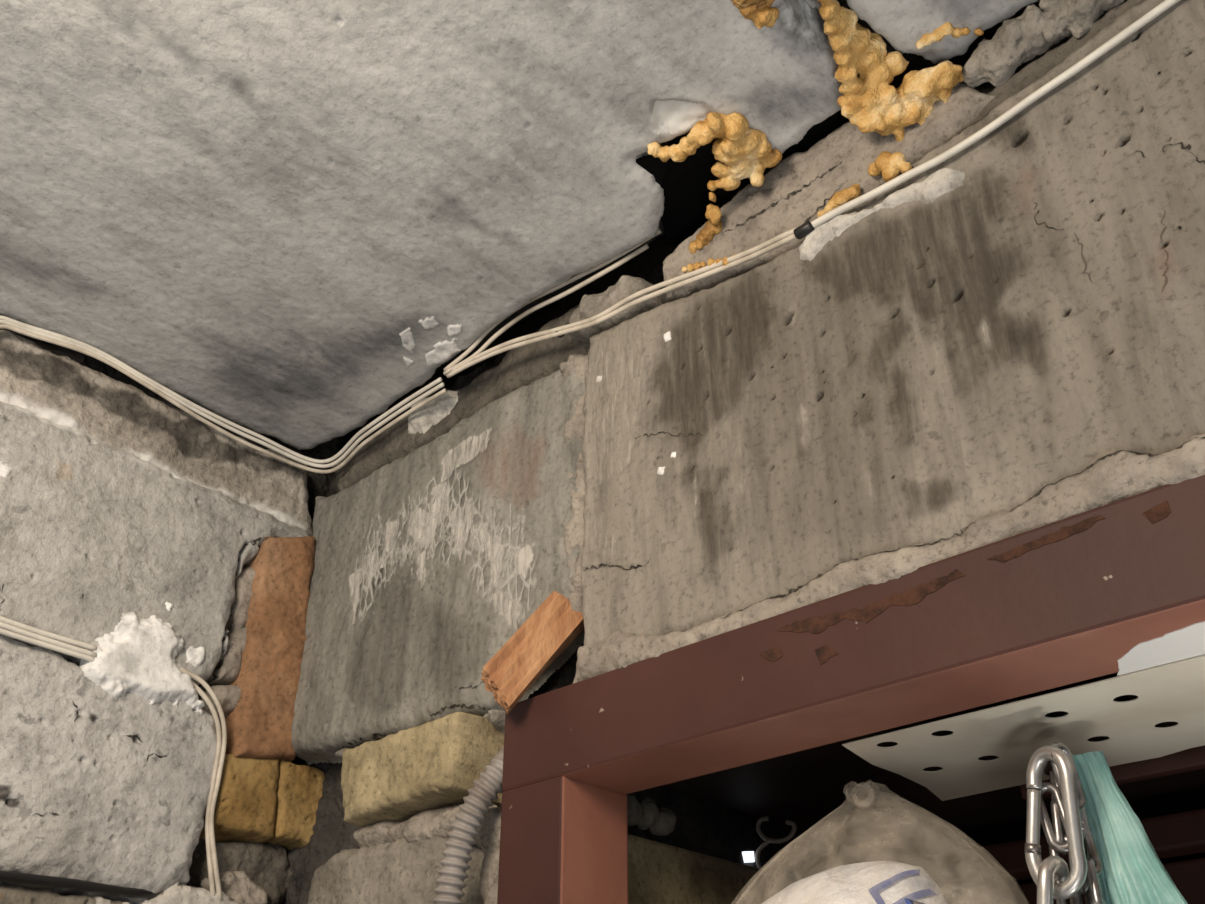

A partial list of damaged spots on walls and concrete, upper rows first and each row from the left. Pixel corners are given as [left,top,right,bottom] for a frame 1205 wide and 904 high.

crack [725,161,842,232]
damp [910,180,1034,358]
damp [586,336,641,480]
damp [664,284,768,444]
damp [349,430,537,630]